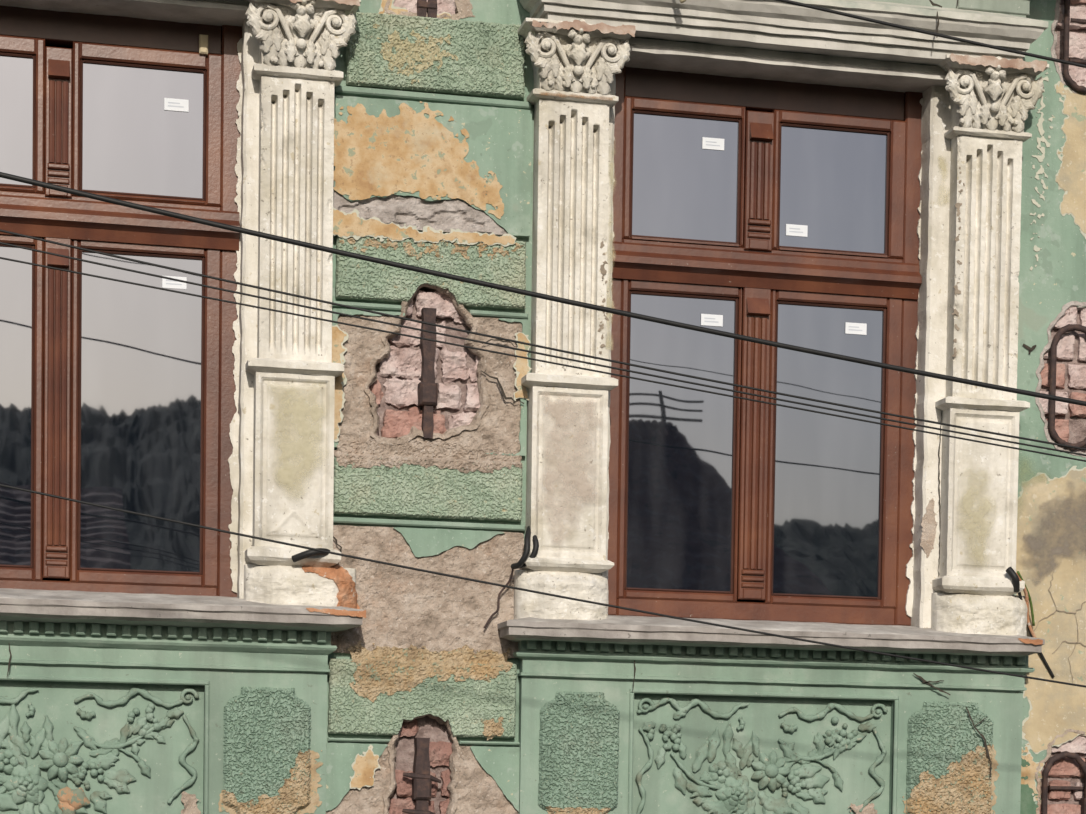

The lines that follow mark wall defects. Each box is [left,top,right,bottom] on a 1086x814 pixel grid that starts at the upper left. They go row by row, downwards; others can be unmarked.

peeling [366,0,475,84]
peeling [333,101,523,260]
peeling [950,0,1086,271]
flaking render [332,284,532,474]
peeling [1016,301,1086,814]
flaking render [302,525,524,703]
crack [1034,572,1086,679]
flaking render [181,791,201,814]
flaking render [218,714,518,814]
peeling [546,806,610,814]
peeling [903,743,999,814]